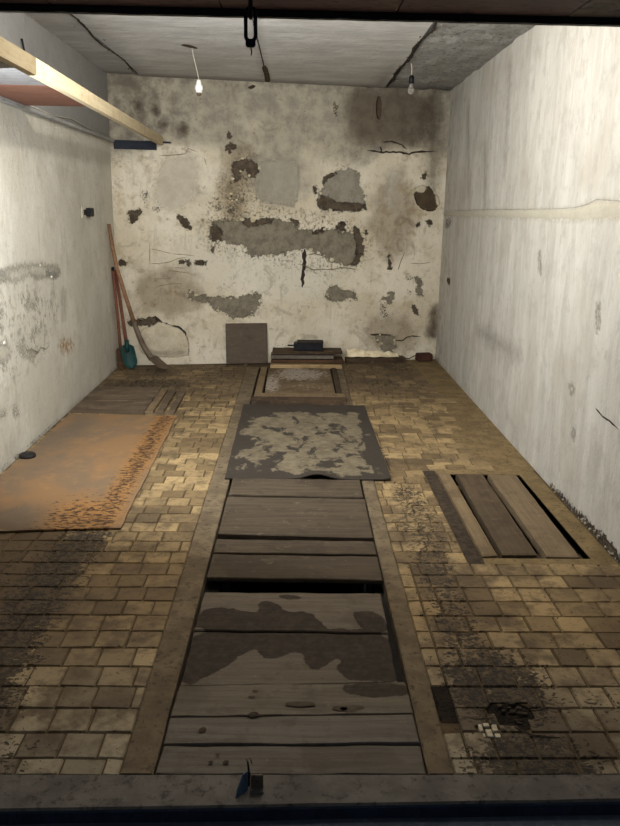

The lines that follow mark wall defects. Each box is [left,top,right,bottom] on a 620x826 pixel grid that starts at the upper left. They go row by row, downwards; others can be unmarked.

crack [367,141,435,155]
spalling [127,207,160,224]
spalling [176,214,193,231]
spalling [179,131,368,269]
spalling [412,172,440,227]
crack [299,249,354,287]
spalling [188,289,262,320]
spalling [325,285,358,302]